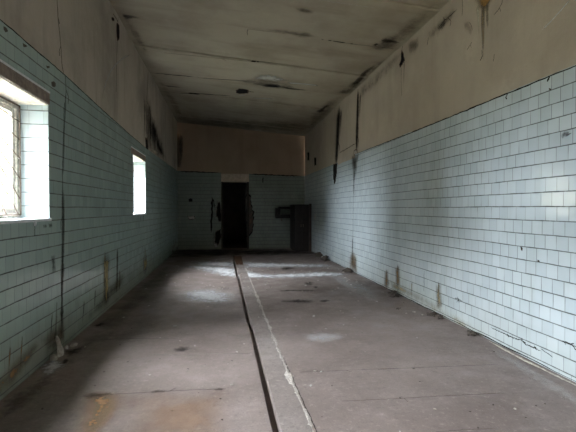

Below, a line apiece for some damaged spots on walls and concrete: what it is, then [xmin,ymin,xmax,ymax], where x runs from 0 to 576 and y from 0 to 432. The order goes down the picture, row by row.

crack [0,6,147,145]
crack [330,260,576,382]